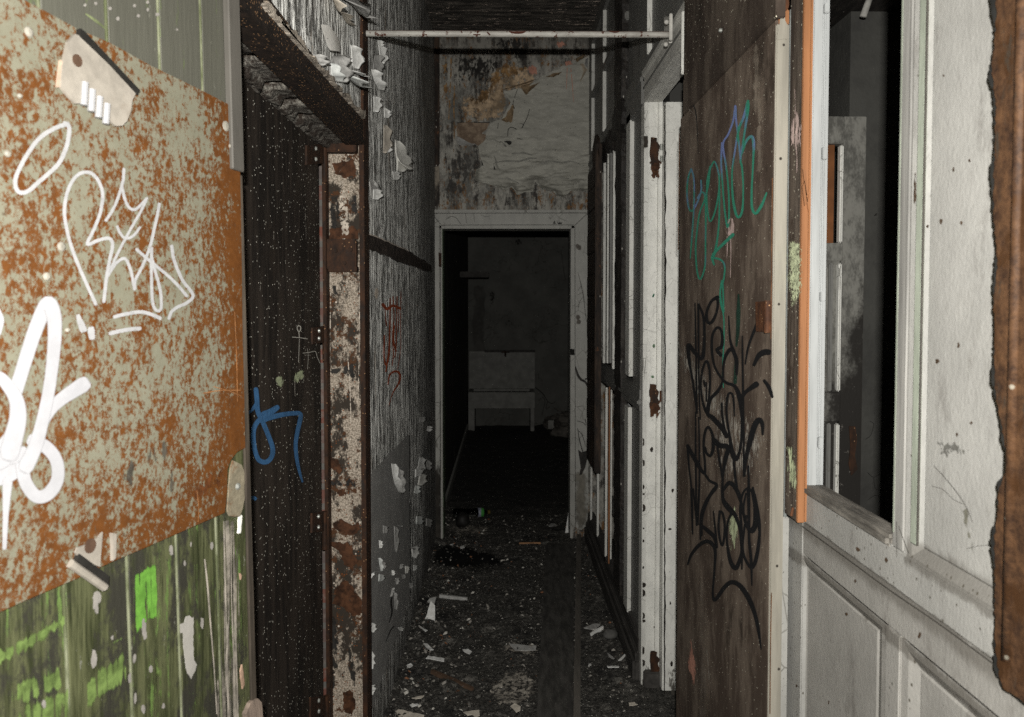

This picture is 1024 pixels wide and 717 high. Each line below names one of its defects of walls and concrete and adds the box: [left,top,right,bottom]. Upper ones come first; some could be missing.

spalling [261,0,414,180]
peeling [503,72,561,94]
corrosion [332,159,356,178]
corrosion [650,161,662,179]
peeling [369,181,384,200]
corrosion [329,226,359,239]
corrosion [649,401,660,418]
peeling [391,457,433,494]
corrosion [332,519,362,616]
peeling [371,525,420,609]
peeling [419,597,436,632]
corrosion [343,690,356,716]